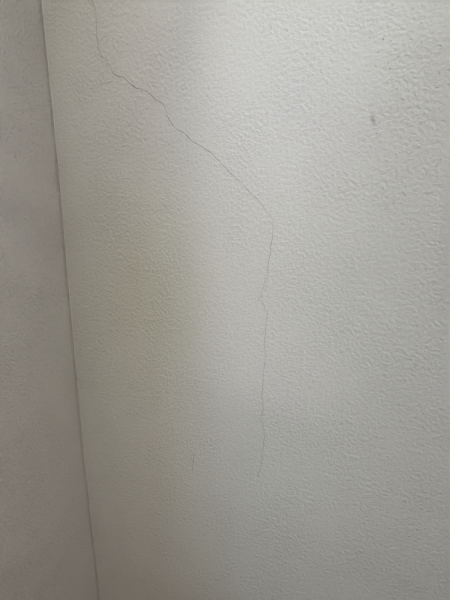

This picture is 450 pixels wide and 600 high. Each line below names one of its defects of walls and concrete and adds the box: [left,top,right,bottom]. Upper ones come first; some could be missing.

crack [88,0,273,475]